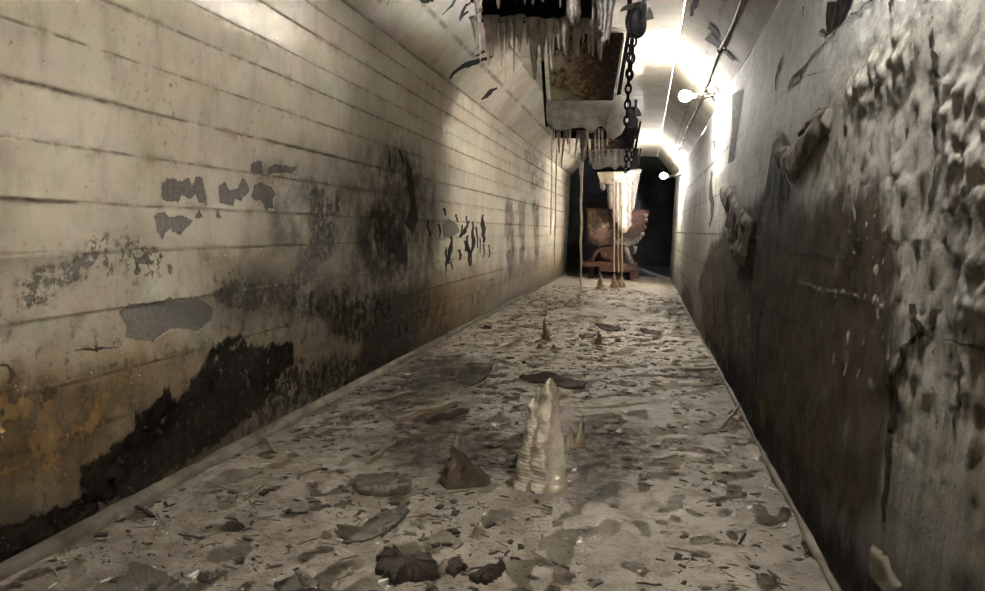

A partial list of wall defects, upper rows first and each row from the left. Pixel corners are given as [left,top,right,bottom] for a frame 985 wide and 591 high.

spalling [826,0,852,32]
peeling [152,161,297,242]
peeling [119,297,214,342]
leakage [0,161,490,563]
leakage [699,184,897,591]